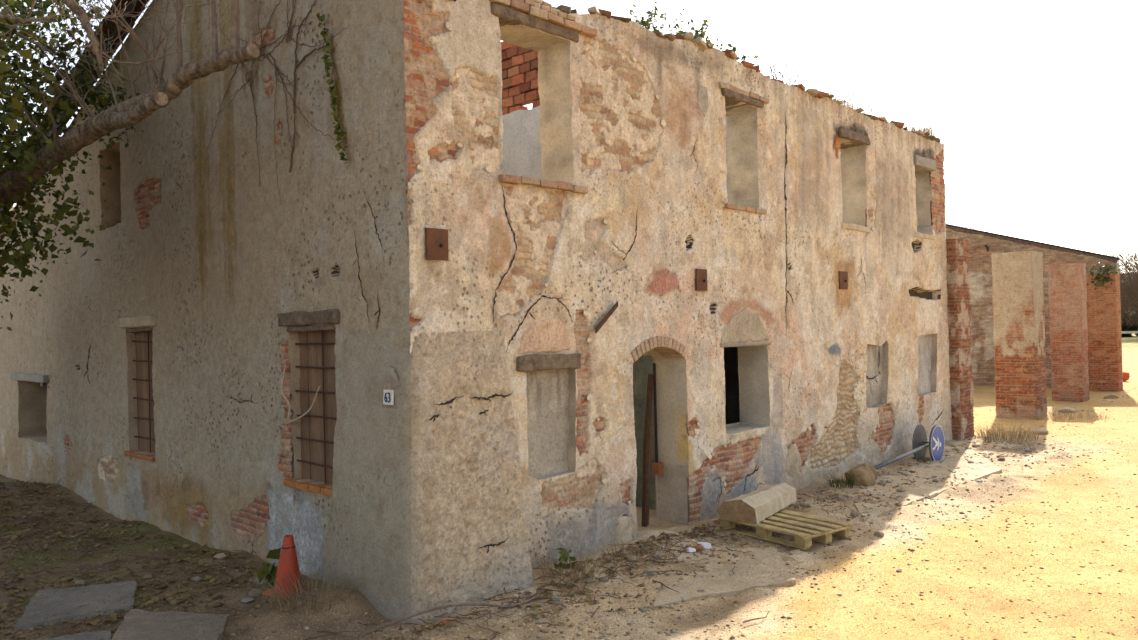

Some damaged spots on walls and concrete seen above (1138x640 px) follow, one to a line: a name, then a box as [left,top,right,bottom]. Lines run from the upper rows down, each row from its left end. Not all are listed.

spalling [402,0,568,317]
spalling [579,36,666,176]
crack [784,118,793,333]
spalling [231,491,270,541]
spalling [276,341,294,479]
spalling [540,310,631,519]
spalling [688,437,761,524]
spalling [787,361,897,472]